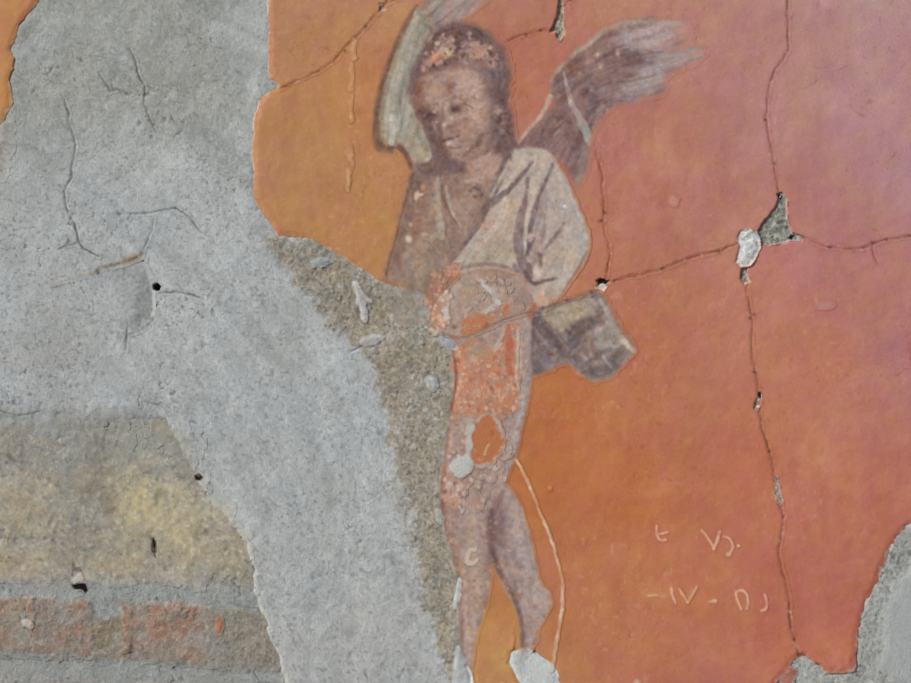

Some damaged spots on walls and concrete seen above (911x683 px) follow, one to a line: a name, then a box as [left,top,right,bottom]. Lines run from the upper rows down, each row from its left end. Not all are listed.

crack [96,45,157,133]
crack [269,0,402,94]
flaking render [549,0,565,42]
crack [762,0,794,195]
crack [50,95,102,281]
crack [413,147,739,343]
flaking render [735,194,802,285]
crack [799,233,911,265]
flaking render [124,262,160,337]
flaking render [350,278,386,347]
crack [744,280,805,664]
flaking render [70,571,85,585]